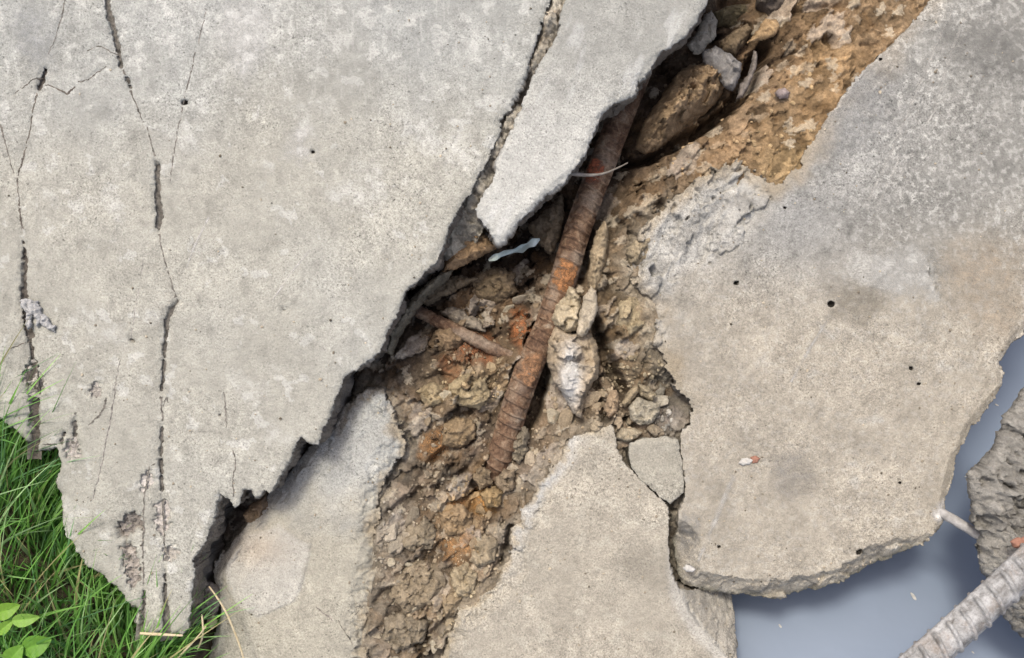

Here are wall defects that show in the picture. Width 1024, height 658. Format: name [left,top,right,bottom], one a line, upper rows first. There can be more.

crack [443,0,565,261]
corrosion [586,158,604,182]
corrosion [552,258,578,292]
crack [0,0,206,642]
corrosion [459,334,492,363]
corrosion [513,311,542,386]
spalling [349,0,930,658]
crack [223,392,236,496]
crack [625,438,686,508]
spalling [222,491,269,550]